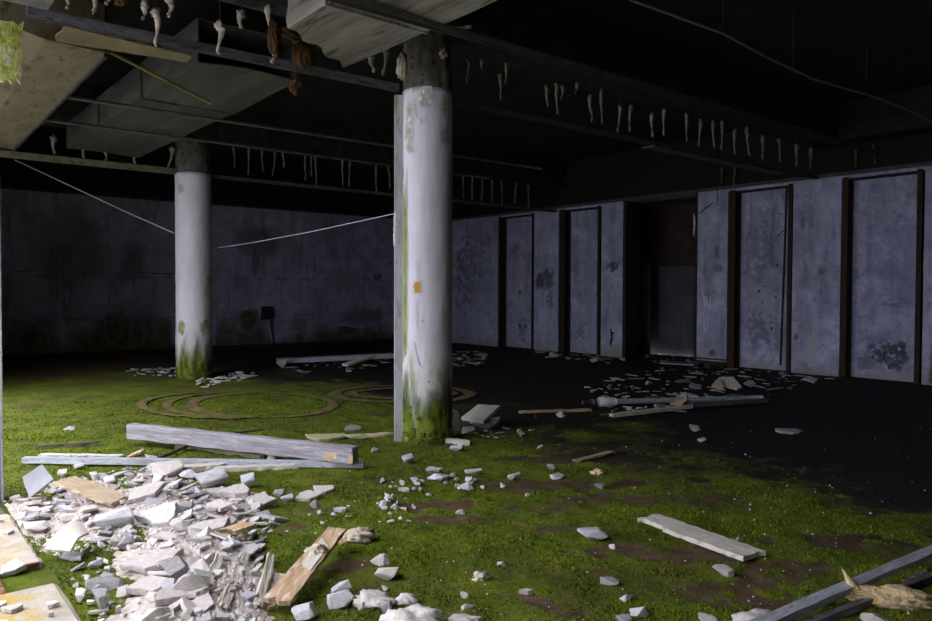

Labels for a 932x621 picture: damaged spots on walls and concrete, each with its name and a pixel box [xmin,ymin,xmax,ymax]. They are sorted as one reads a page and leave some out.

peeling [405,86,451,148]
rust [413,261,422,329]